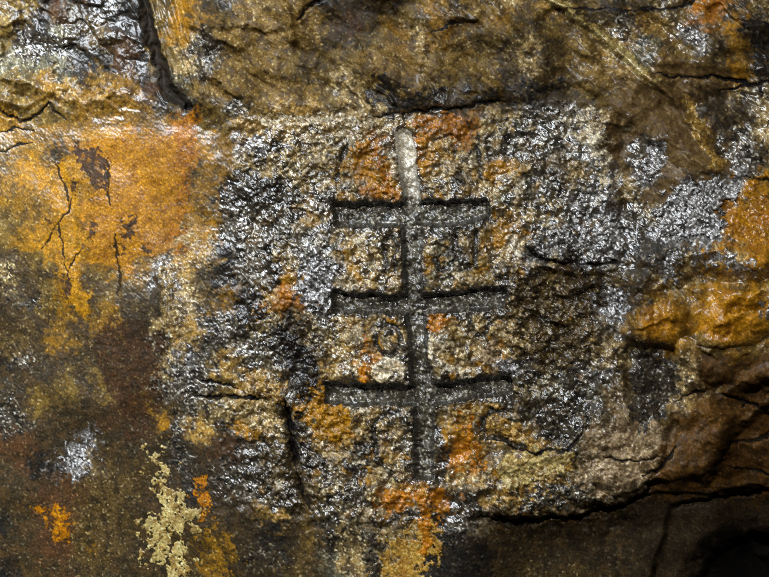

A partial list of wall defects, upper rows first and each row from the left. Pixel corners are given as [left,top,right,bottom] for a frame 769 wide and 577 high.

crack [653,72,769,97]
crack [0,102,67,152]
crack [103,157,111,205]
crack [41,161,82,277]
crack [114,233,122,295]
crack [673,388,769,410]
crack [186,377,314,511]
crack [478,445,676,523]
crack [667,431,769,509]